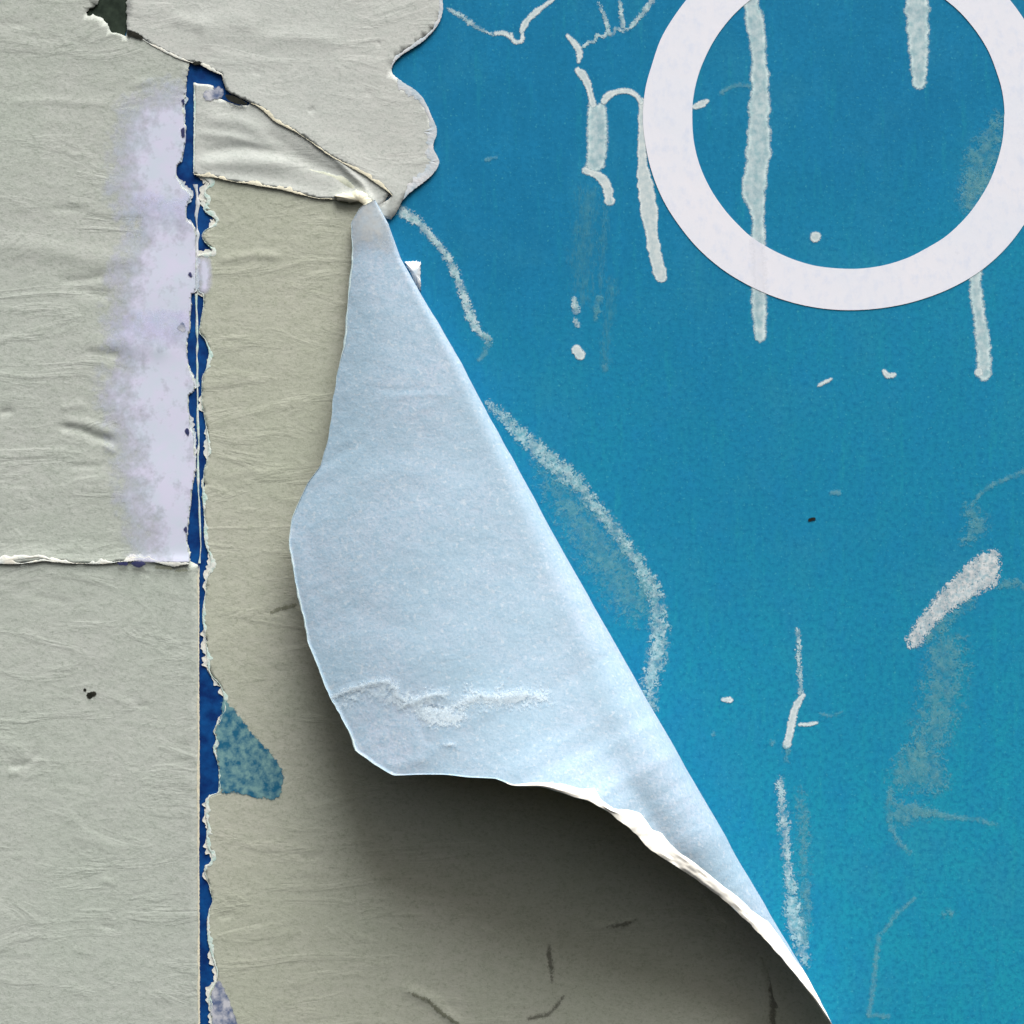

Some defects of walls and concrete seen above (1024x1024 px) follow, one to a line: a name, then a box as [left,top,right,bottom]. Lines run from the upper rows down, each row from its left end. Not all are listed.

peeling [225,95,247,105]
peeling [334,684,549,730]